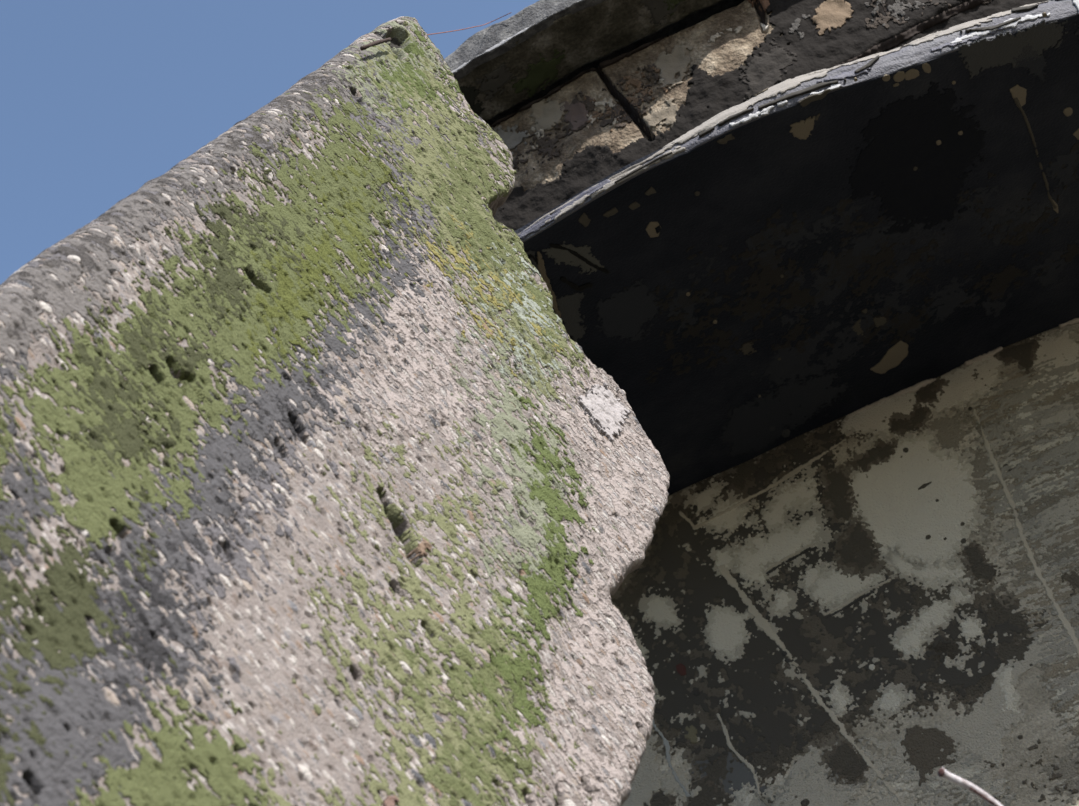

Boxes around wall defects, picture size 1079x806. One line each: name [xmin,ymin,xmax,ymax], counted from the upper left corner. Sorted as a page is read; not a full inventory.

spalling [451,16,550,73]
spalling [491,97,565,155]
peeling [517,0,1051,238]
spalling [308,249,508,486]
spalling [504,251,887,806]
peeling [695,378,938,502]
leakage [610,333,1079,806]
peeling [870,341,908,374]
peeling [880,522,1049,710]
crack [970,404,1079,658]
peeling [896,725,960,787]
peeling [1018,735,1079,806]